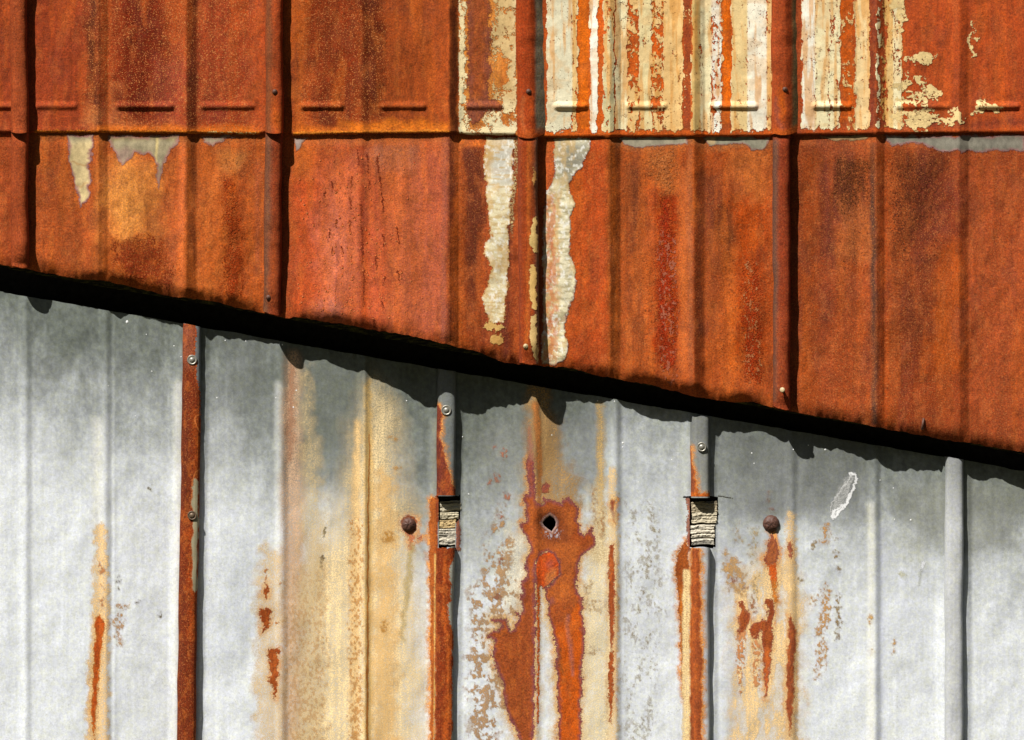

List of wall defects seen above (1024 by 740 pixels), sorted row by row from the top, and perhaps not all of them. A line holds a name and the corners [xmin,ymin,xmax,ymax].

peeling [67,134,94,208]
peeling [107,134,180,190]
peeling [202,134,239,147]
peeling [458,0,518,345]
peeling [528,0,772,385]
peeling [800,0,1024,153]
rust [85,524,111,740]
rust [177,323,201,740]
rust [253,351,461,740]
rust [486,385,620,740]
rust [673,446,710,740]
rust [729,511,805,740]